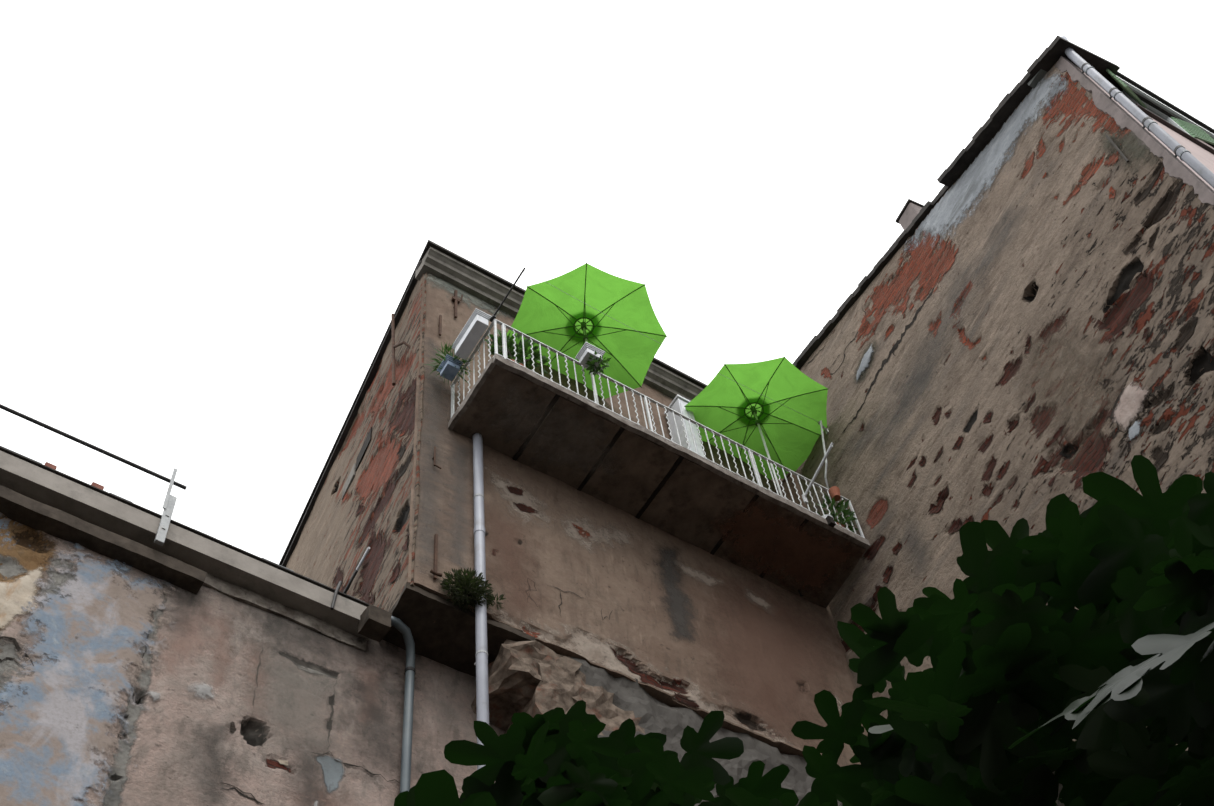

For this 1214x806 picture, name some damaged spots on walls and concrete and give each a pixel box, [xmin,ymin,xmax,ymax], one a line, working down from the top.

peeling [1021,72,1132,206]
crack [806,309,866,379]
crack [842,264,952,433]
peeling [854,228,963,383]
spalling [1093,161,1183,344]
peeling [332,347,420,604]
spalling [906,350,1214,534]
peeling [0,515,77,691]
crack [217,783,264,804]
spalling [230,720,294,774]
spalling [471,609,787,743]
leakage [659,547,694,640]